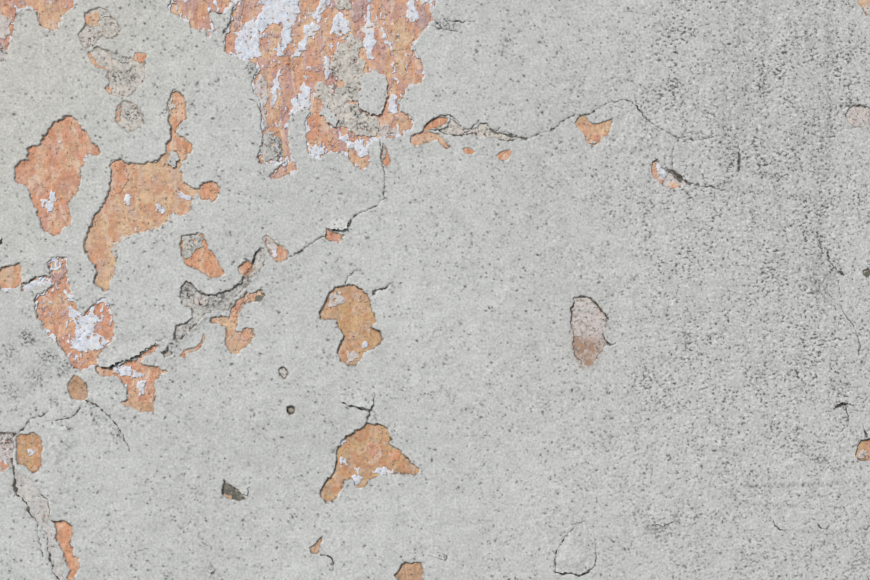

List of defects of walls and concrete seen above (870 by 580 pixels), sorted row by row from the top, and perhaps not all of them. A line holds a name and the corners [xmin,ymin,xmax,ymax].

peeling [168,0,513,180]
crack [413,99,713,141]
crack [289,100,391,257]
crack [668,162,718,189]
peeling [0,89,225,412]
spalling [173,235,288,354]
peeling [319,285,383,366]
peeling [0,433,43,473]
crack [0,401,128,446]
peeling [320,423,419,502]
crack [11,458,59,579]
peeling [45,508,80,580]